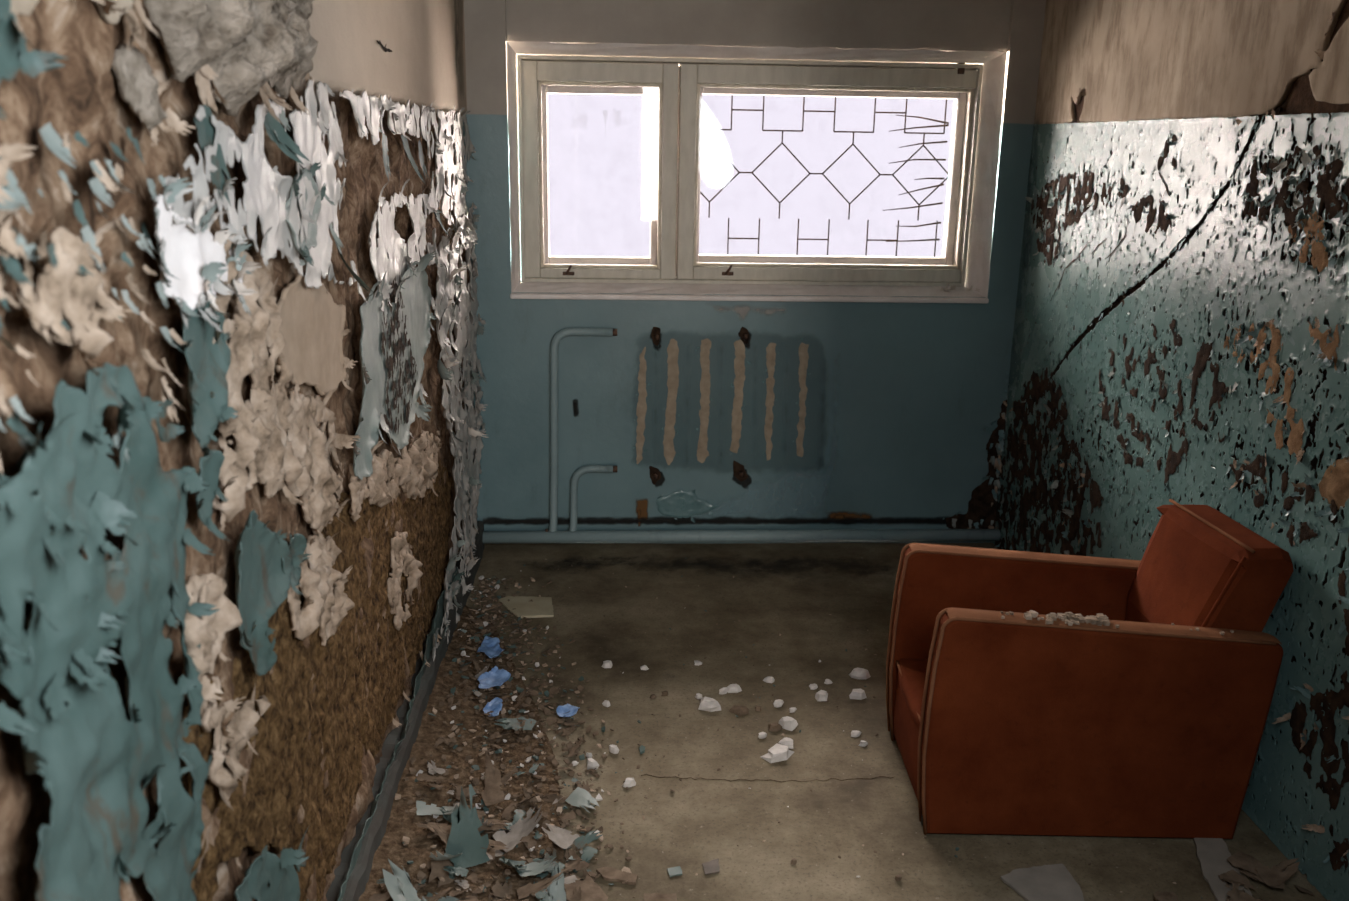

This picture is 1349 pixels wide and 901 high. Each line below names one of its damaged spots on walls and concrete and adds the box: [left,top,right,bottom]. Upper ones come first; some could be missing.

flaking render [1071,88,1087,127]
peeling [1025,170,1171,266]
crack [1031,95,1288,399]
peeling [1157,129,1177,170]
flaking render [1235,72,1349,126]
peeling [1240,145,1349,272]
flaking render [1315,0,1349,59]
peeling [0,0,526,901]
peeling [943,367,1104,556]
peeling [1096,317,1349,547]
peeling [415,658,638,901]
peeling [1272,566,1349,874]